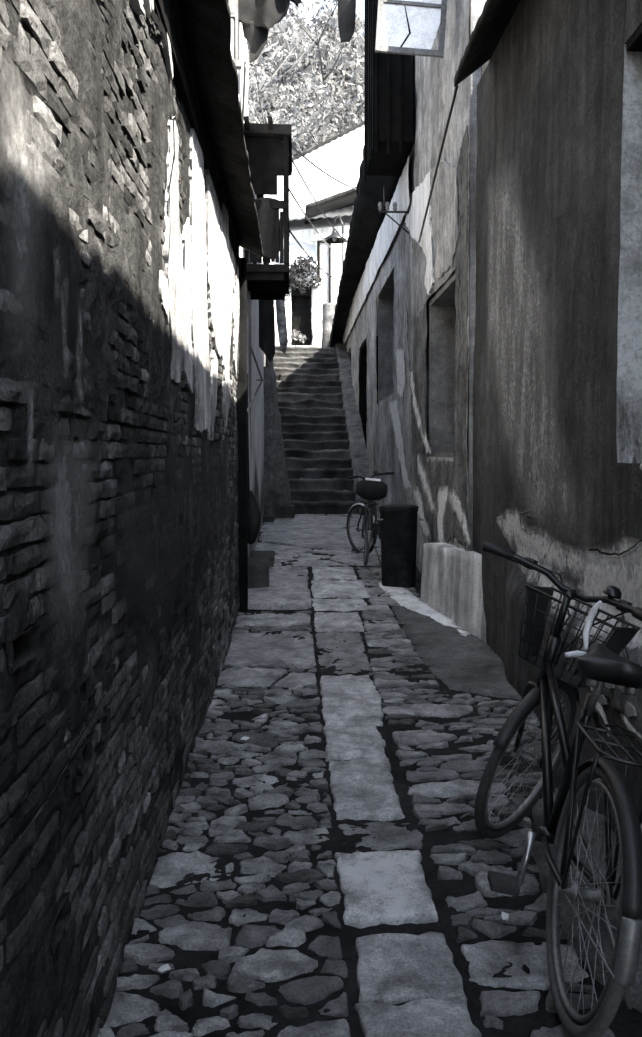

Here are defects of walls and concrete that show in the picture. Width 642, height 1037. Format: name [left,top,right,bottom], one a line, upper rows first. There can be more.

peeling [129,0,154,15]
peeling [161,31,173,80]
peeling [159,116,240,440]
crack [588,540,642,578]
peeling [498,509,642,666]
spalling [591,683,642,739]